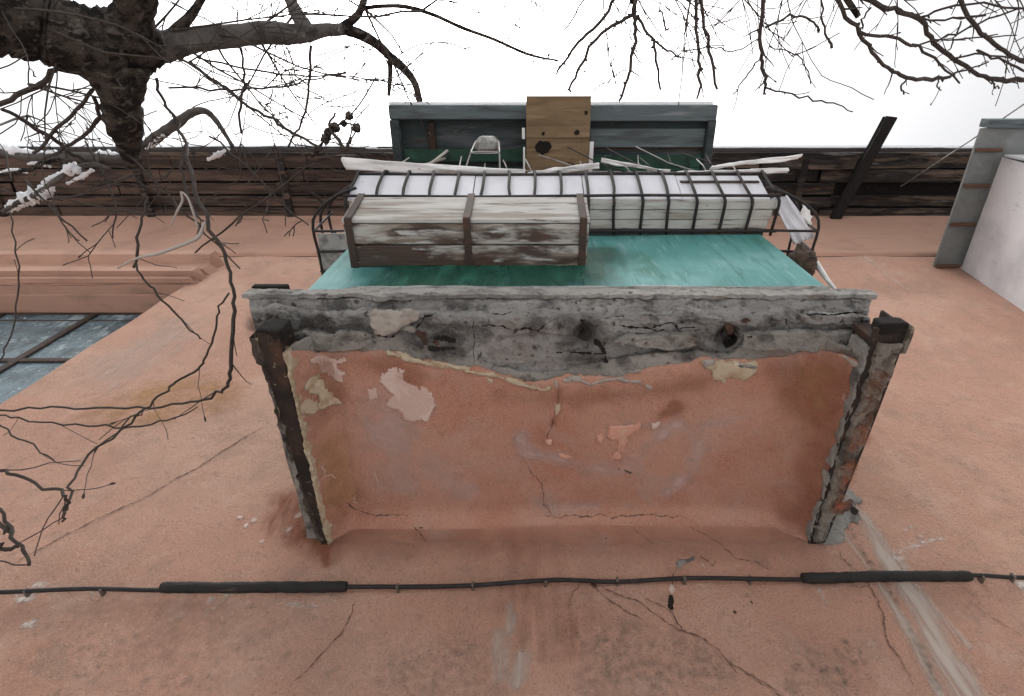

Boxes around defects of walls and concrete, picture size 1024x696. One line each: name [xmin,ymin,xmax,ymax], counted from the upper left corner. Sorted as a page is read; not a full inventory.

peeling [292,355,346,436]
peeling [368,308,652,422]
crack [472,311,553,356]
crack [620,322,695,332]
peeling [701,318,758,383]
crack [785,312,862,332]
crack [1,426,264,571]
crack [524,461,783,696]
damp [860,512,981,696]